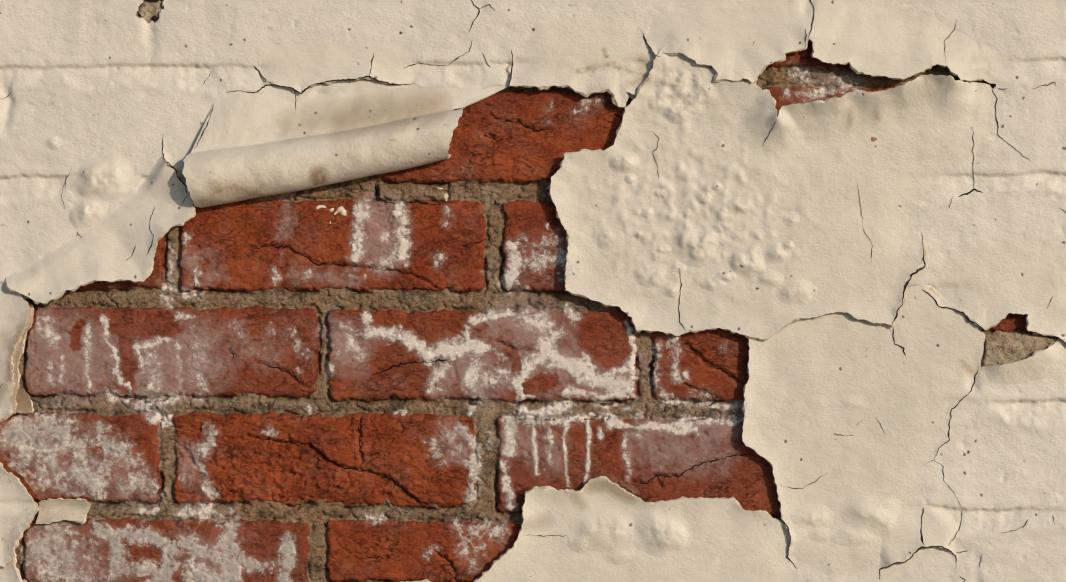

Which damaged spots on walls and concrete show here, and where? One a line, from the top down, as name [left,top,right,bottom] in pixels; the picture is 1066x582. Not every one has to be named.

crack [162,0,513,205]
peeling [255,37,426,93]
crack [949,85,1030,207]
peeling [0,85,509,422]
peeling [473,0,1066,582]
crack [891,236,986,356]
peeling [0,462,91,582]
efflorescence [0,406,296,582]
efflorescence [339,303,746,510]
crack [783,521,798,568]
crack [877,366,982,582]